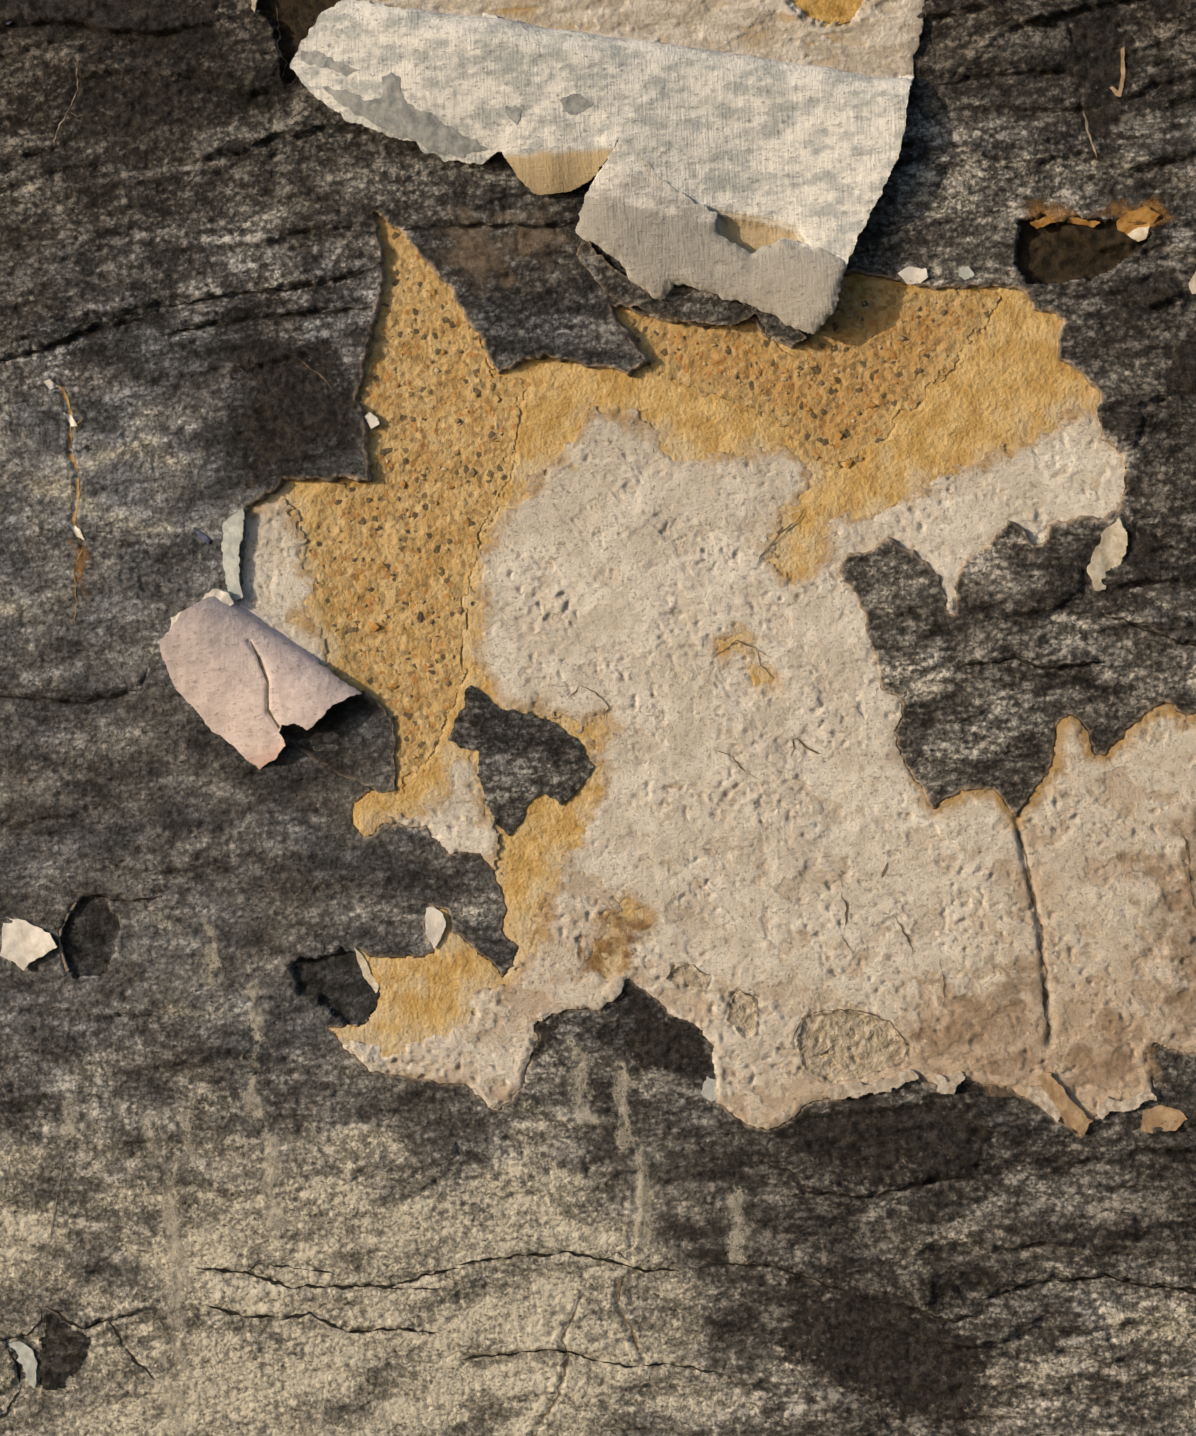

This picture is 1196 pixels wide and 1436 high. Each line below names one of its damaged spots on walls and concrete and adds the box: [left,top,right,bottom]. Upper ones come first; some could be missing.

peeling [159,0,1196,1135]
spalling [0,895,120,979]
crack [1016,824,1052,1043]
crack [751,1161,973,1198]
spalling [9,1314,91,1390]
crack [0,1306,158,1418]
crack [195,1250,1196,1436]